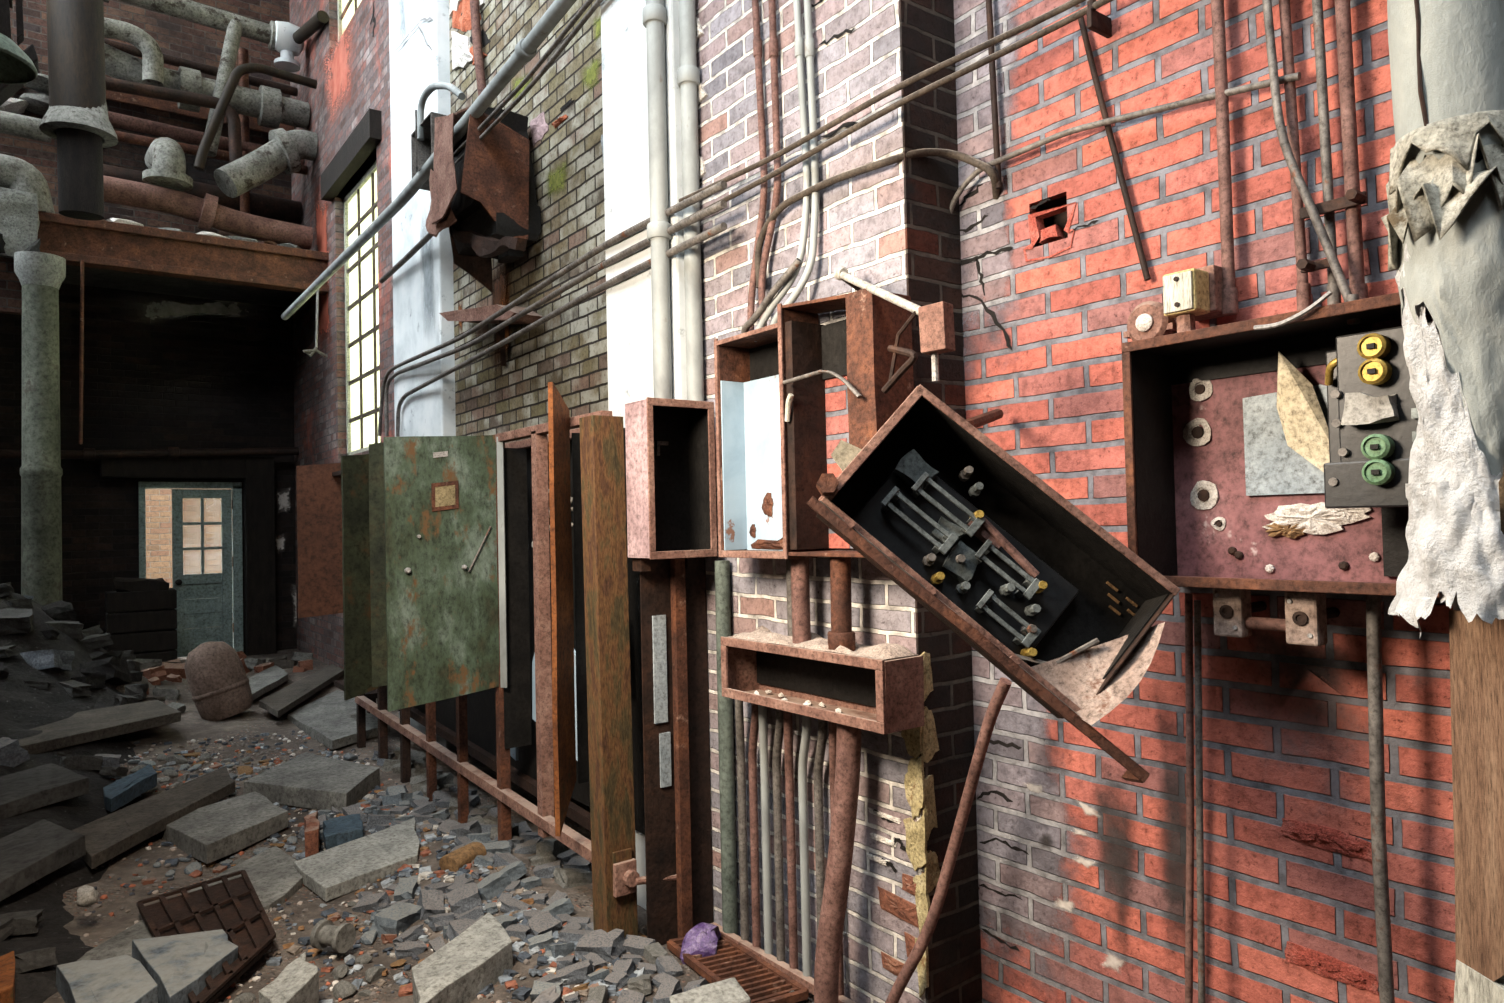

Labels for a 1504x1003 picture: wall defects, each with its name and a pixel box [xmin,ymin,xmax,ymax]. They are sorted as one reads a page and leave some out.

crack [811,0,854,45]
crack [821,121,859,138]
hole [1023,195,1098,262]
crack [959,184,1013,350]